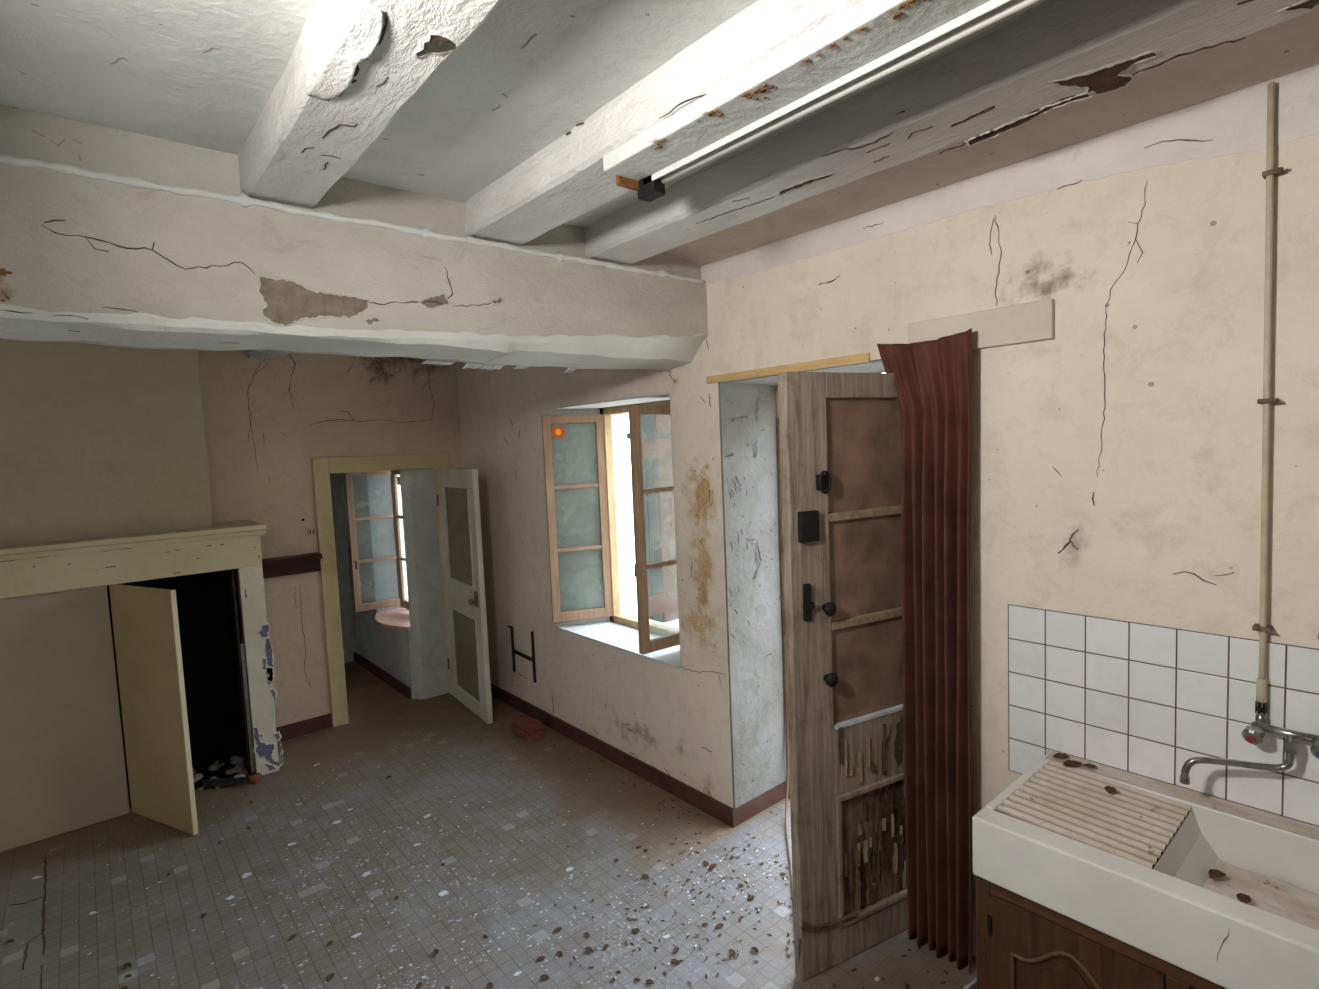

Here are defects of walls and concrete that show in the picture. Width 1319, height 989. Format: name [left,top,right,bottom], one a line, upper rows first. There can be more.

corrosion [888,0,926,20]
spalling [412,29,462,58]
corrosion [741,84,774,100]
peeling [964,48,1162,146]
crack [1145,139,1211,148]
crack [42,220,255,274]
corrosion [0,268,12,302]
spalling [255,275,383,327]
crack [370,268,501,307]
crack [1097,183,1147,477]
damp [372,357,436,376]
peeling [256,623,278,701]